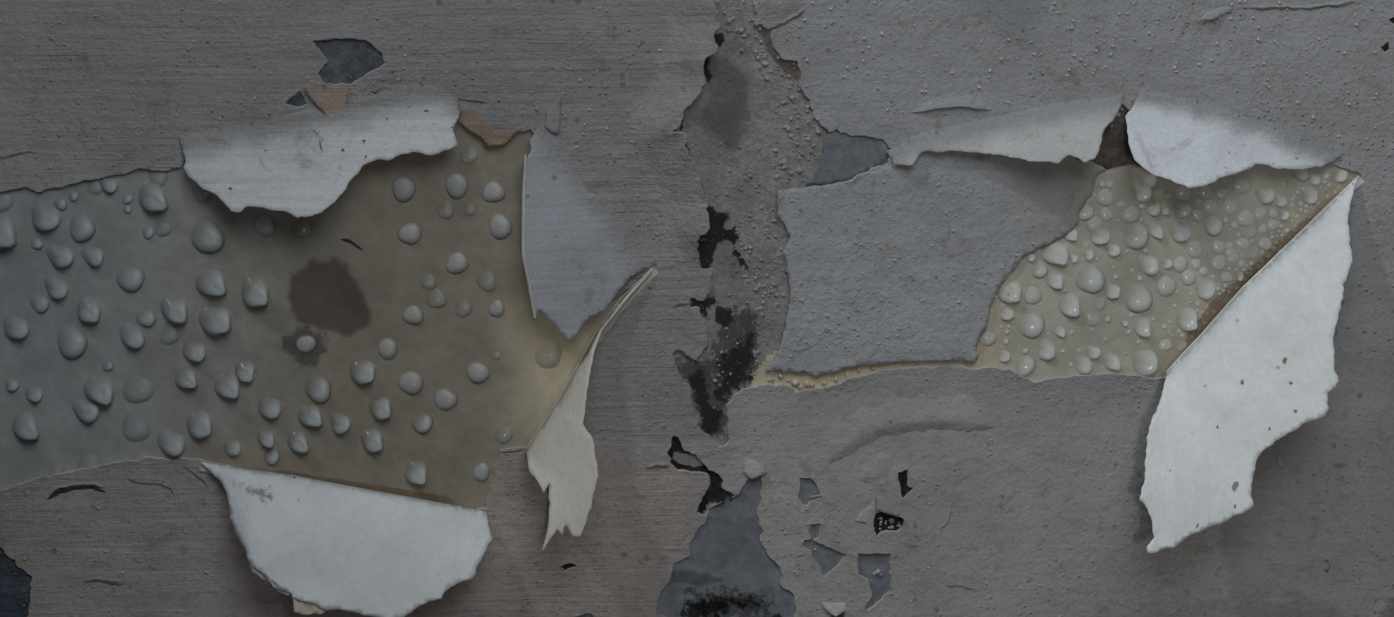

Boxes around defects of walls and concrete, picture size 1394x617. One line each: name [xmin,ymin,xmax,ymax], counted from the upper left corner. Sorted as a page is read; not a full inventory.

peeling [178,39,659,551]
crack [644,0,889,514]
peeling [766,88,1341,377]
peeling [1139,175,1364,554]
peeling [0,548,31,617]
peeling [199,462,492,617]
peeling [656,457,796,617]
spalling [799,478,819,505]
peeling [821,602,846,617]
spalling [804,524,890,609]
spalling [855,470,912,535]